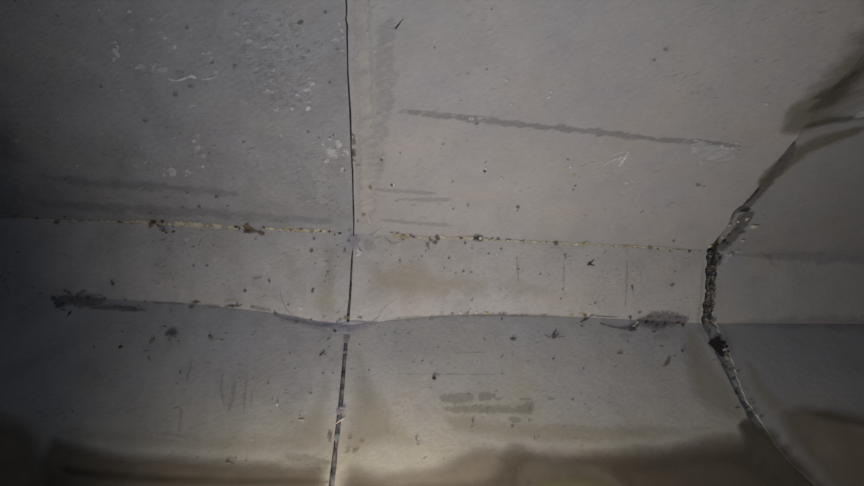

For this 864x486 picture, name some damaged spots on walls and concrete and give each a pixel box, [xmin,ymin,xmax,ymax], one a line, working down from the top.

spalling [708,336,730,360]